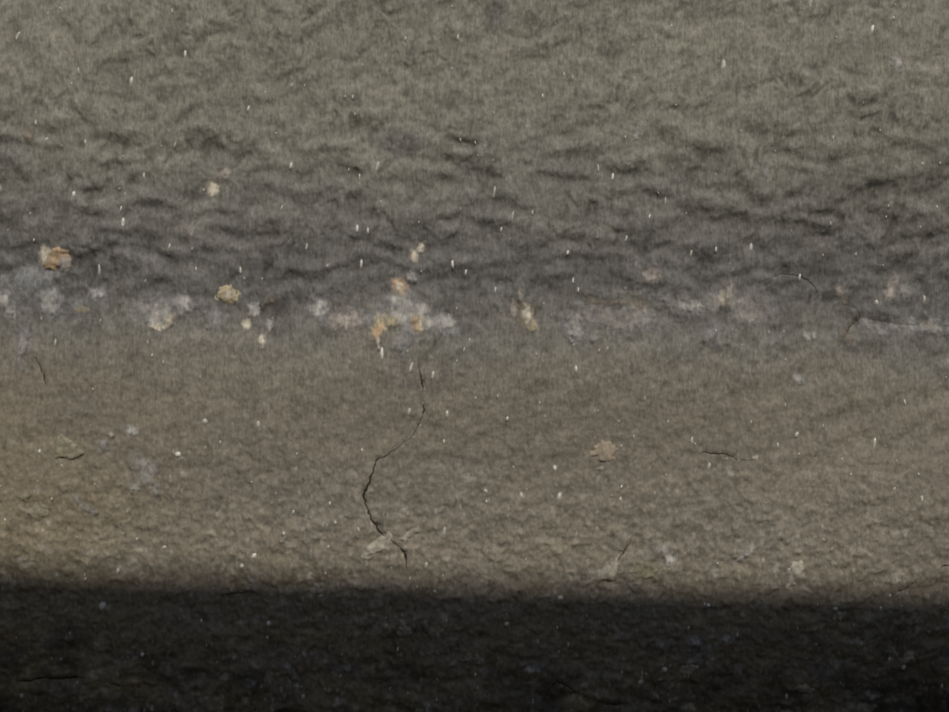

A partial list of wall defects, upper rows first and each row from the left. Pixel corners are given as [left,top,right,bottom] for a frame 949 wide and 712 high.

corrosion [41,246,72,272]
leakage [0,265,109,318]
leakage [134,293,221,333]
corrosion [214,284,241,306]
leakage [241,295,273,347]
leakage [309,243,464,357]
leakage [560,267,771,344]
leakage [884,279,910,298]
leakage [860,315,949,335]
crack [362,364,425,567]
crack [13,676,125,687]